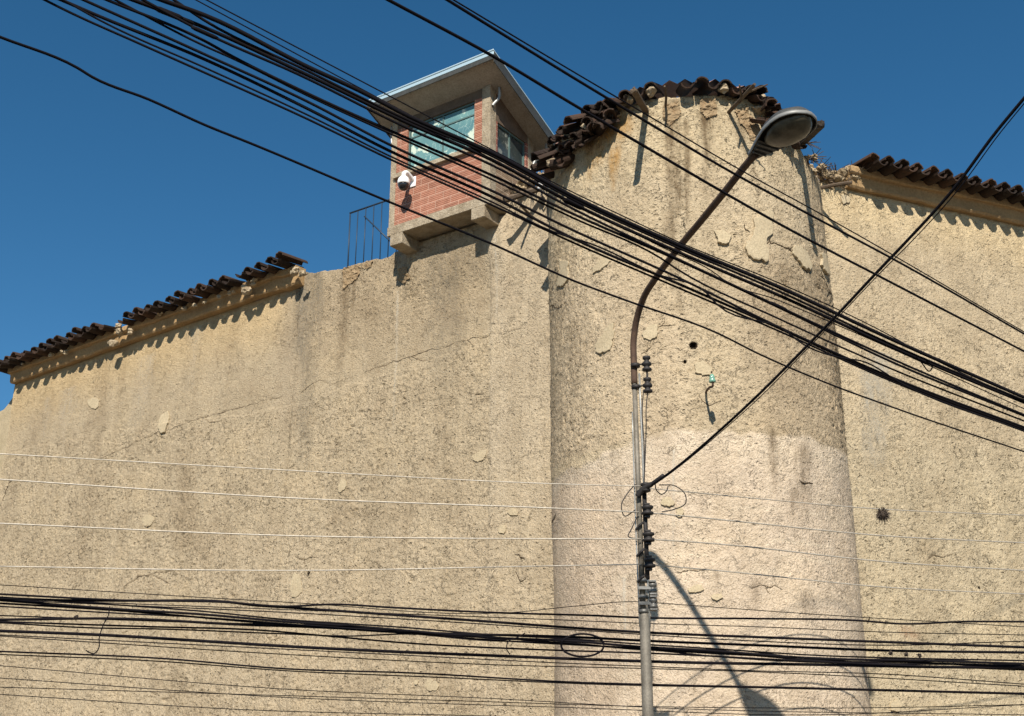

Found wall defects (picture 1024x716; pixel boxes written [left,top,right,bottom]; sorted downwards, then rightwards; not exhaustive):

flaking render [744,210,774,263]
flaking render [791,245,830,275]
flaking render [157,411,170,434]